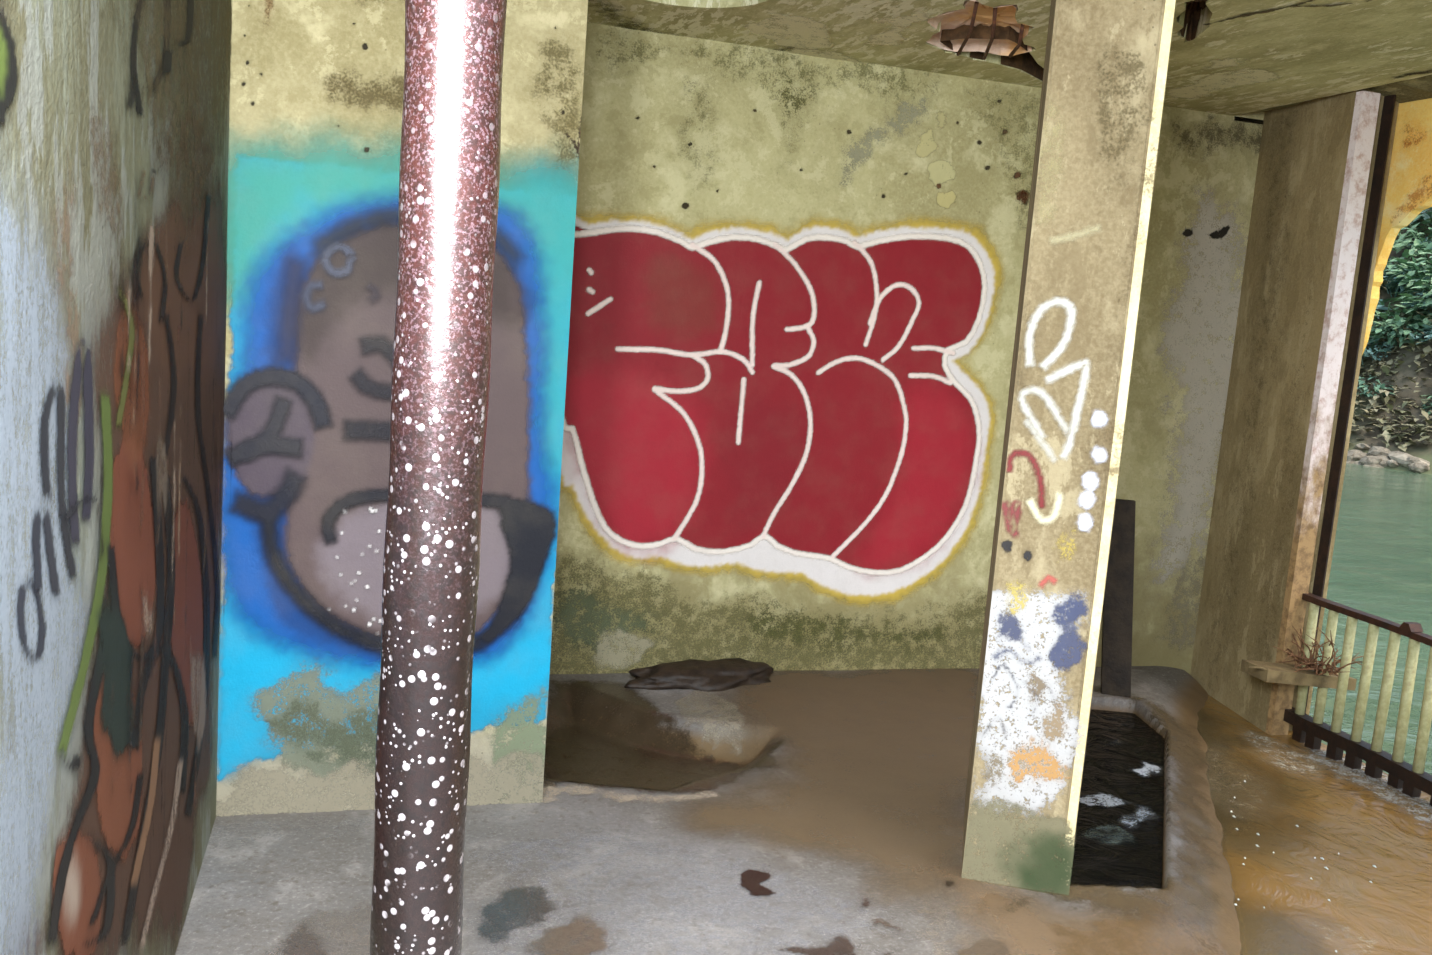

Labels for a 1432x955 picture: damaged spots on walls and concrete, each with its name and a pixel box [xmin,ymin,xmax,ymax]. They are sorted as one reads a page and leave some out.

damp [593,1,668,62]
peeling [746,13,864,64]
spalling [866,0,1044,81]
spalling [1179,0,1207,41]
damp [131,0,232,198]
damp [325,72,404,108]
damp [539,42,581,159]